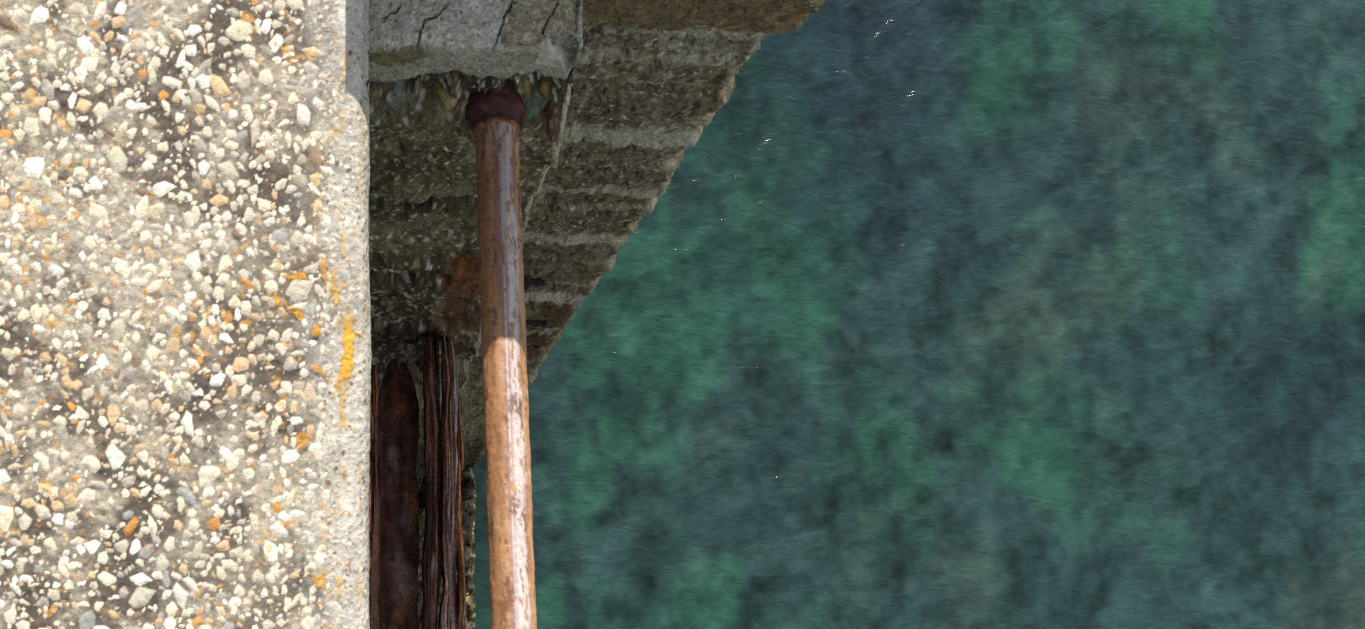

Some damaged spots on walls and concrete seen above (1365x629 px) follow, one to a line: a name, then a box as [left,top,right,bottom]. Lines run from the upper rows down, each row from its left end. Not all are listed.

crack [382,6,446,44]
crack [494,0,577,48]
corrosion [369,332,466,629]